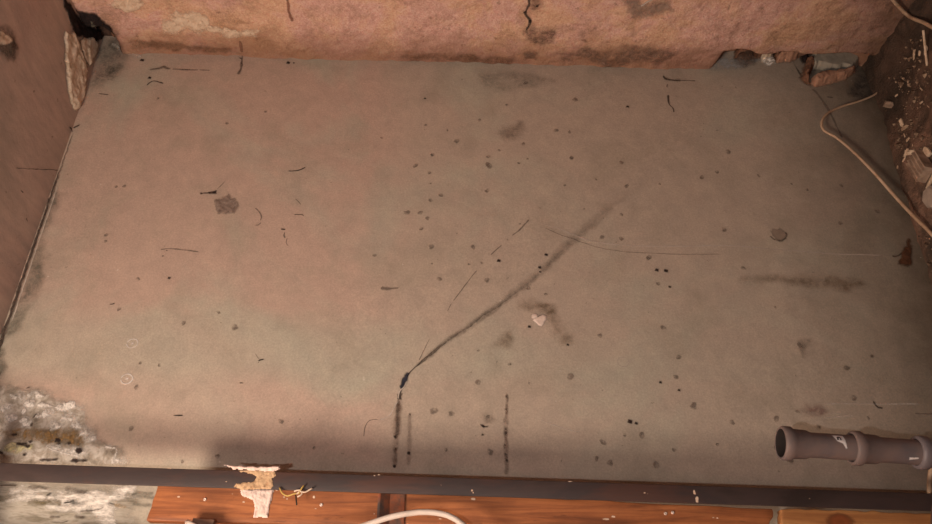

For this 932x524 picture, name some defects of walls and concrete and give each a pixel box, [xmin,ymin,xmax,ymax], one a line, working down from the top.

crack [523,0,555,59]
spalling [64,31,98,111]
water stain [0,385,127,465]
water stain [0,483,148,524]
peeling [224,465,280,518]